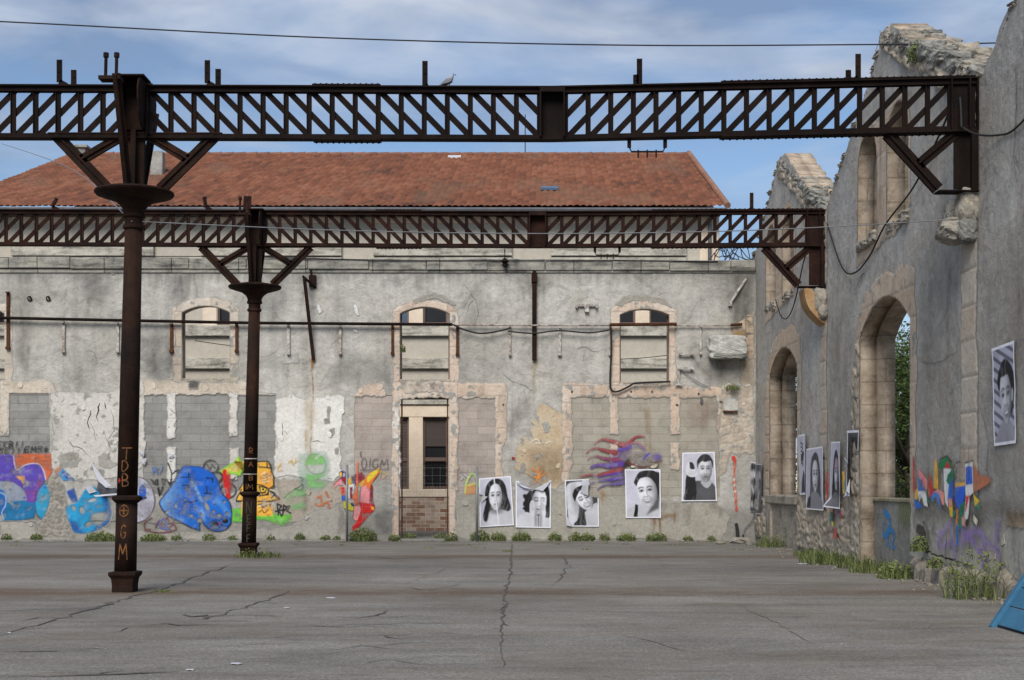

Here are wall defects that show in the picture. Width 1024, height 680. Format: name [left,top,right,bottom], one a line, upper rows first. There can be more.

flaking render [0,378,120,539]
flaking render [138,378,246,469]
flaking render [256,383,386,539]
flaking render [455,404,730,540]
flaking render [137,529,242,539]
crack [2,562,464,676]
crack [410,543,571,666]